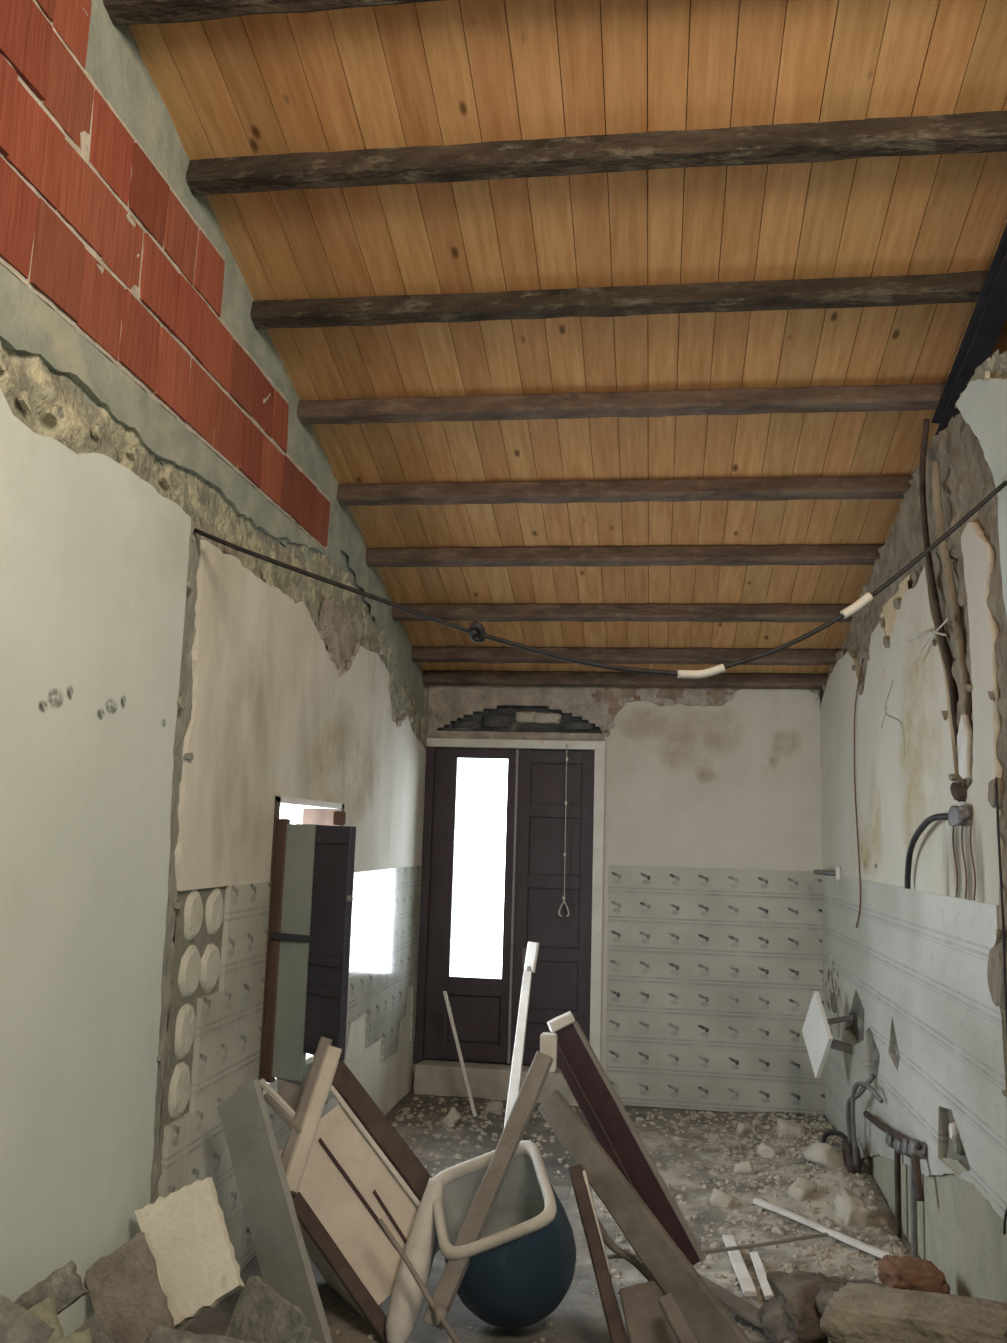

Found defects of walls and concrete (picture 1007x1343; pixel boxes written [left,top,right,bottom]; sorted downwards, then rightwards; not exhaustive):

spalling [0,263,741,746]
spalling [808,413,998,700]
peeling [825,951,900,1078]
flaking render [863,1109,1007,1302]